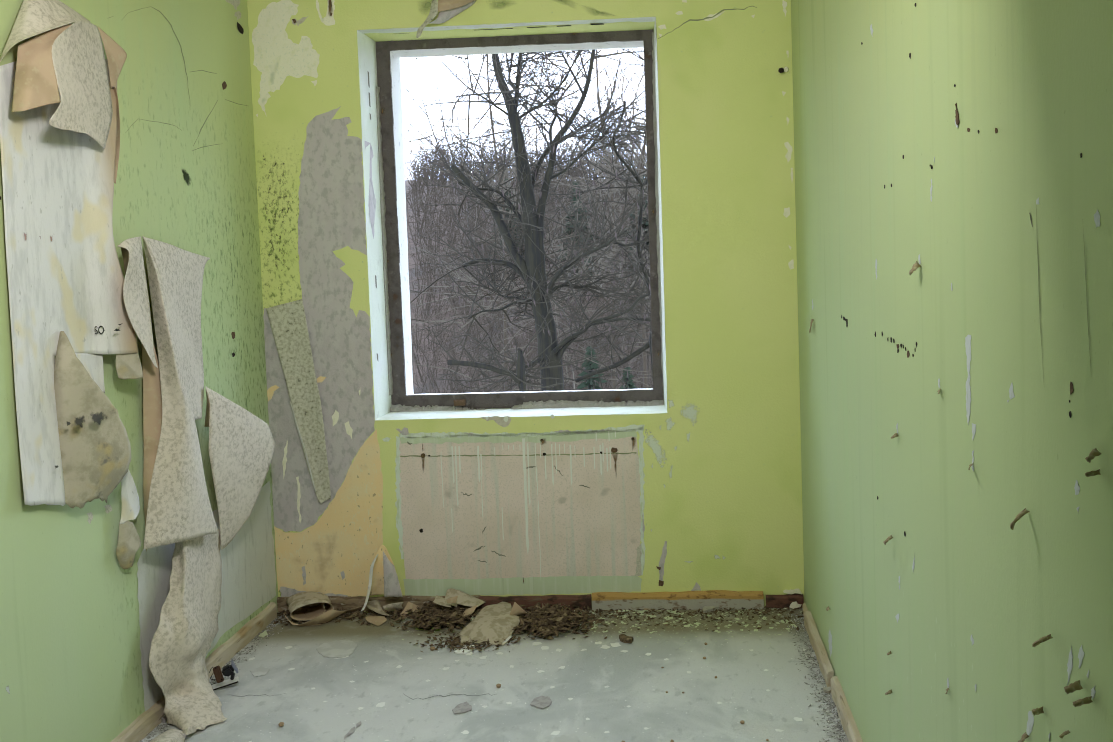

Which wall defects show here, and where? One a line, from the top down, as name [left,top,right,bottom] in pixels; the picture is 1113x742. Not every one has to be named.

peeling [225,0,335,117]
crack [658,6,757,39]
peeling [206,86,700,656]
peeling [137,543,175,711]